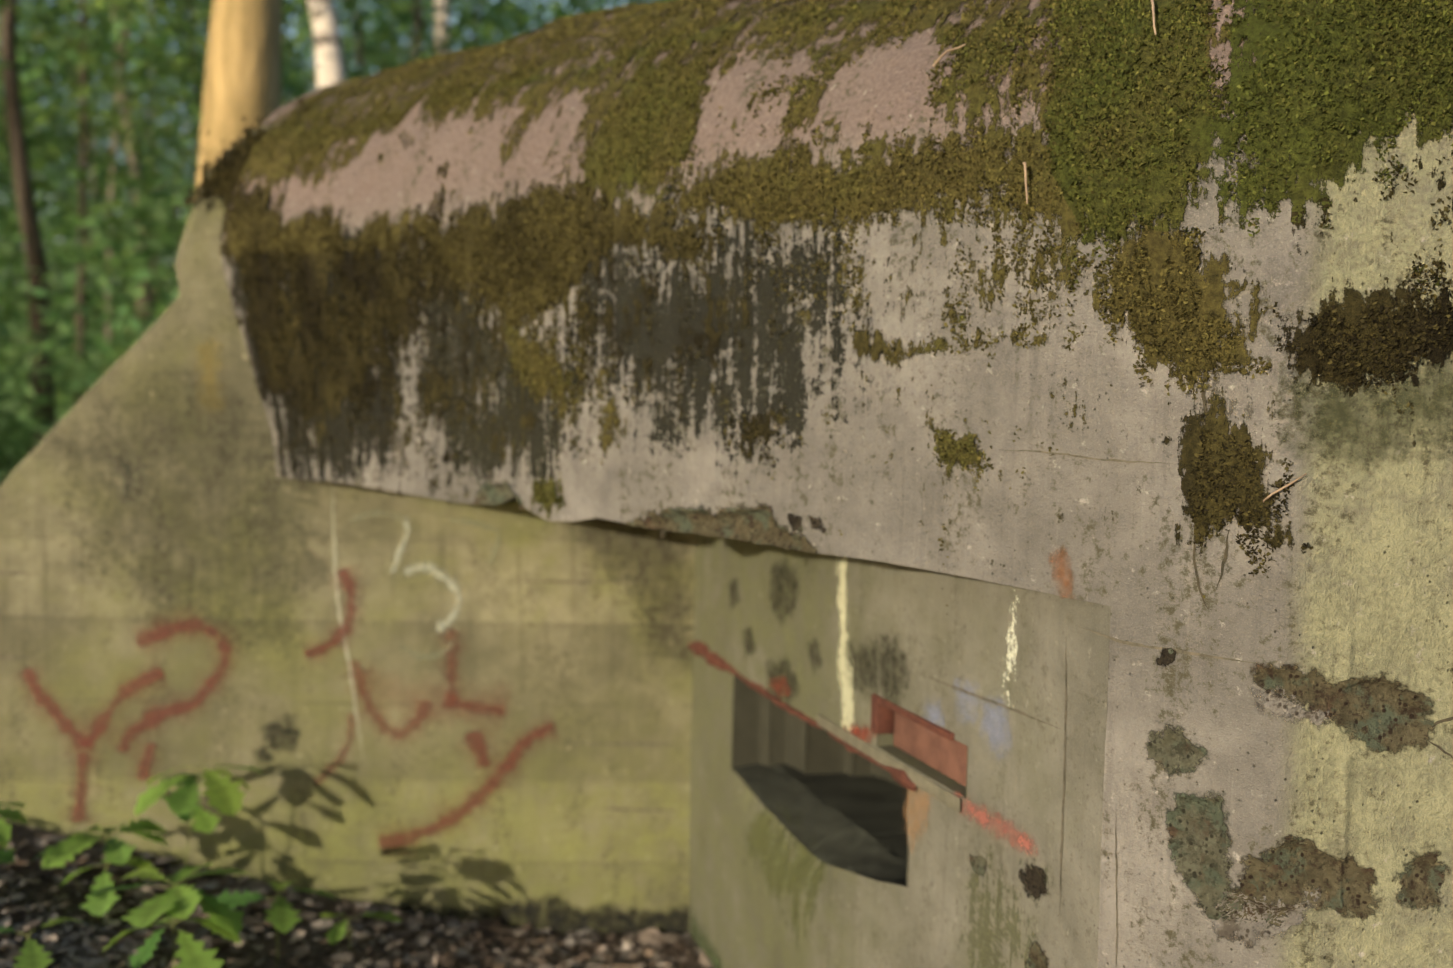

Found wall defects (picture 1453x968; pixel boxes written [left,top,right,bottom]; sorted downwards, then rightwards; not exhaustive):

leakage [221,183,884,486]
spalling [627,504,826,554]
spalling [1250,663,1435,754]
spalling [1146,724,1450,948]
spalling [1019,864,1047,900]
leakage [362,897,690,937]
spalling [1025,941,1048,968]